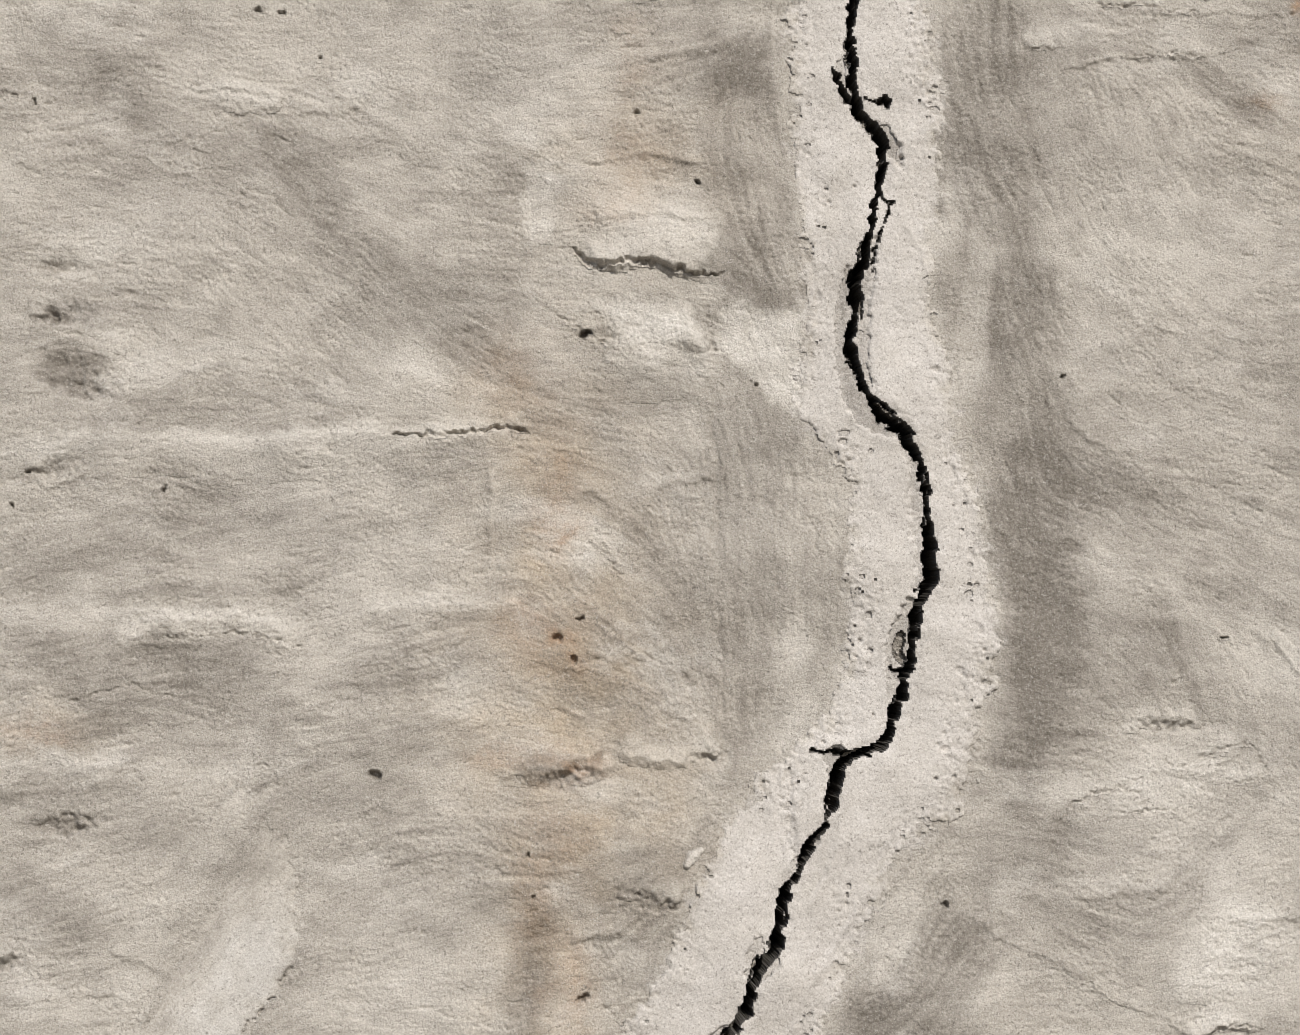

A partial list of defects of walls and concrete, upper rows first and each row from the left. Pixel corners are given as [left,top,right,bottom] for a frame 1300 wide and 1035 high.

crack [572,246,725,278]
crack [720,0,941,1035]